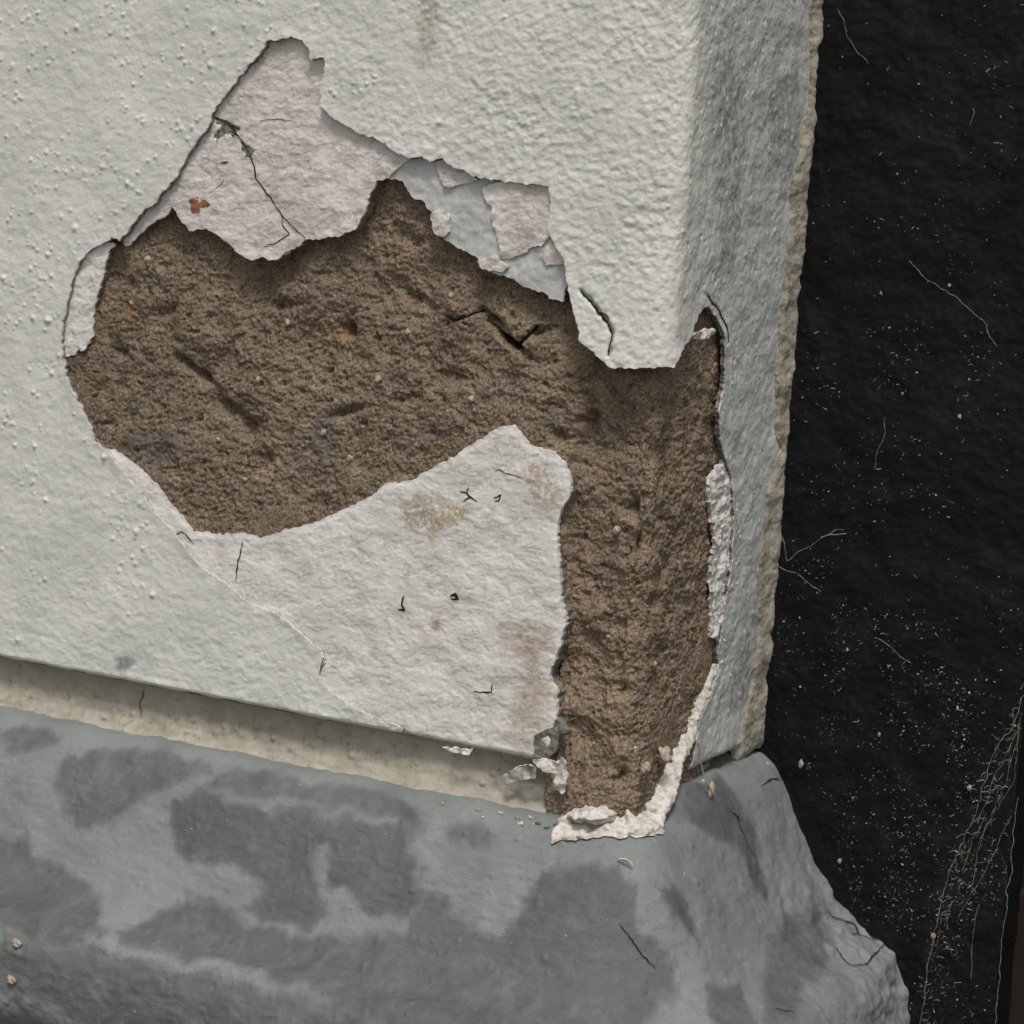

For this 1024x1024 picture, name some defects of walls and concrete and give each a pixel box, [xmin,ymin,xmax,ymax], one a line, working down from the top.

crack [214,117,305,247]
crack [445,310,539,349]
crack [580,290,613,356]
flaking render [64,37,744,843]
leakage [0,840,98,940]
leakage [123,794,671,1024]
leakage [667,888,693,931]
leakage [684,778,766,895]